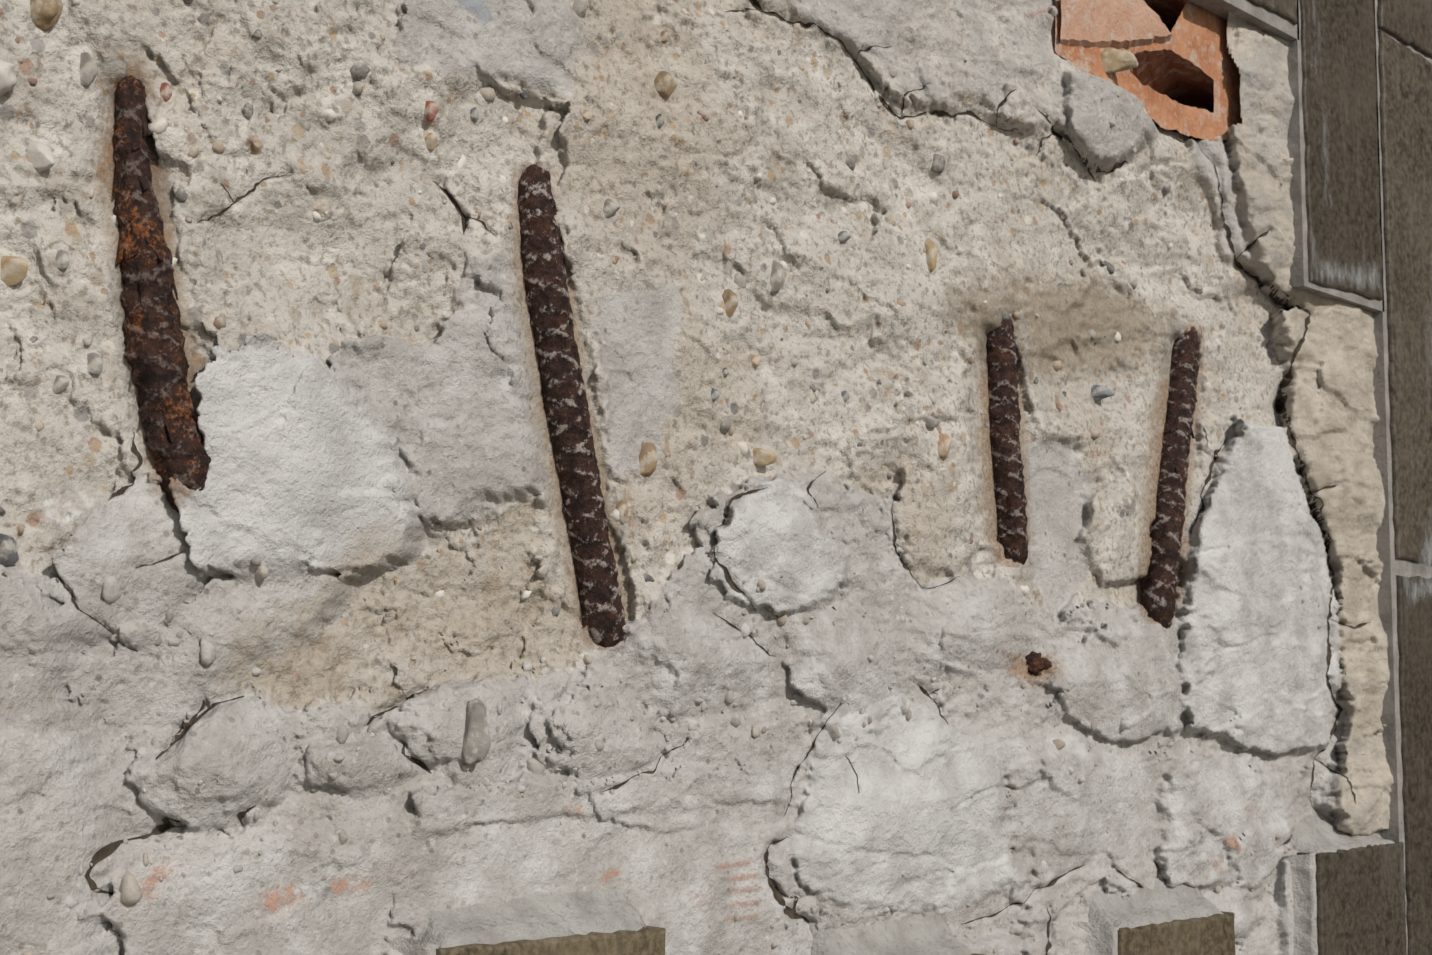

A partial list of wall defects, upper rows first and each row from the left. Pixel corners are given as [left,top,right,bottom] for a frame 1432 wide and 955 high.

crack [725,0,1129,181]
crack [1197,142,1371,810]
crack [964,861,1160,955]